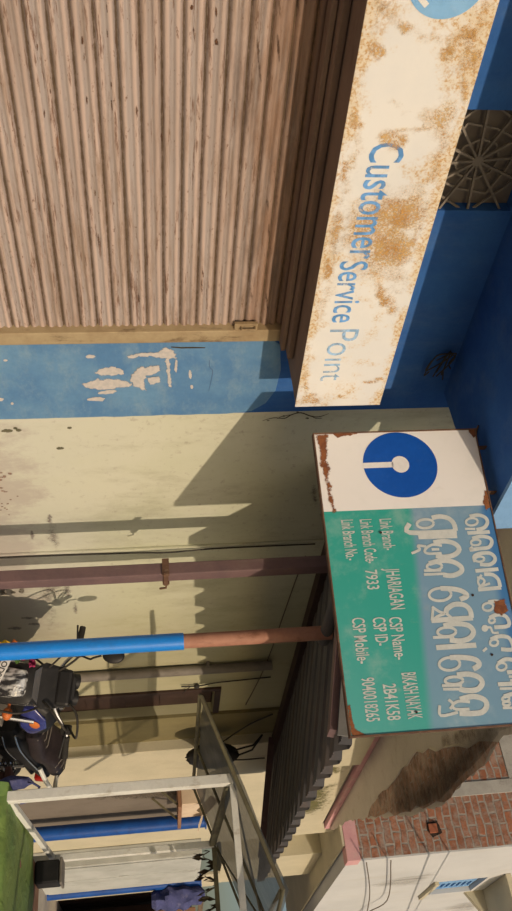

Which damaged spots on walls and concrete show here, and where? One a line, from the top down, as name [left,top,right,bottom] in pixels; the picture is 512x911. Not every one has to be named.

peeling [82,348,178,401]
crack [263,411,329,421]
flaking render [367,741,498,818]